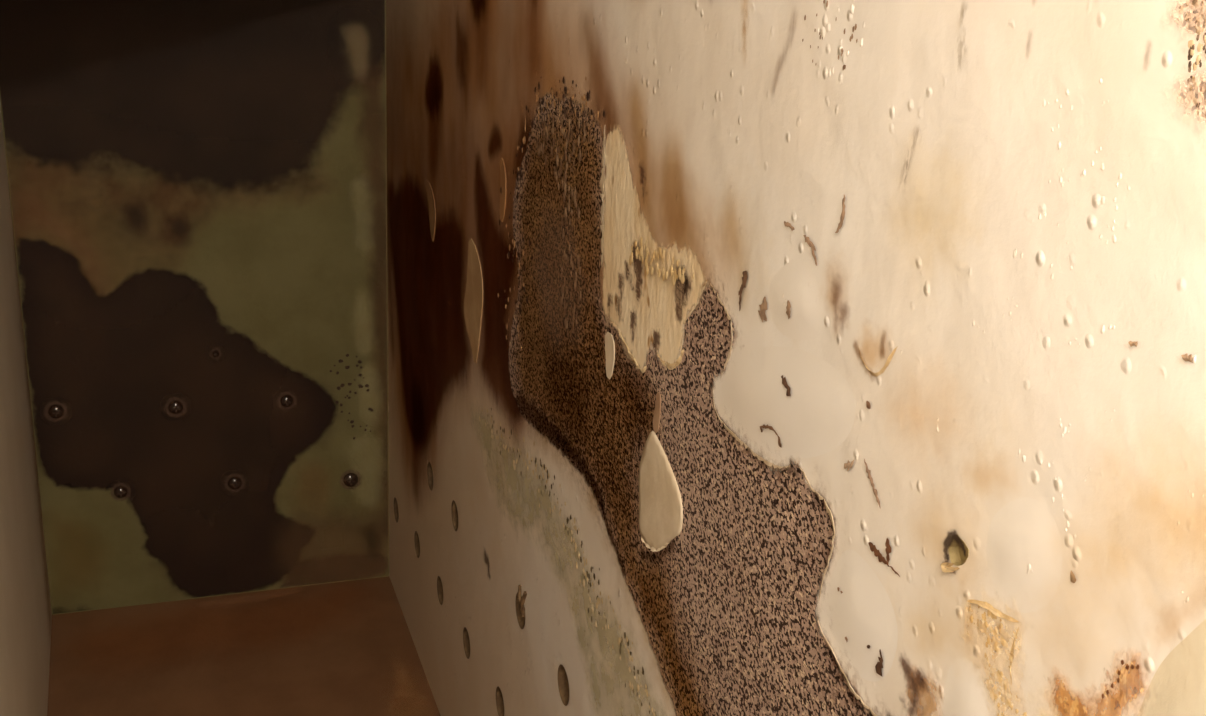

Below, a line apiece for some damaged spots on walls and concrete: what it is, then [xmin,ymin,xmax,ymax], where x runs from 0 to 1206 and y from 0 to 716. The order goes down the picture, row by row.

peeling [1179,0,1206,118]
leakage [0,0,467,598]
leakage [477,165,520,416]
peeling [464,77,877,716]
peeling [858,347,897,377]
spalling [940,530,969,573]
spalling [867,645,883,676]
rust [1054,660,1142,716]